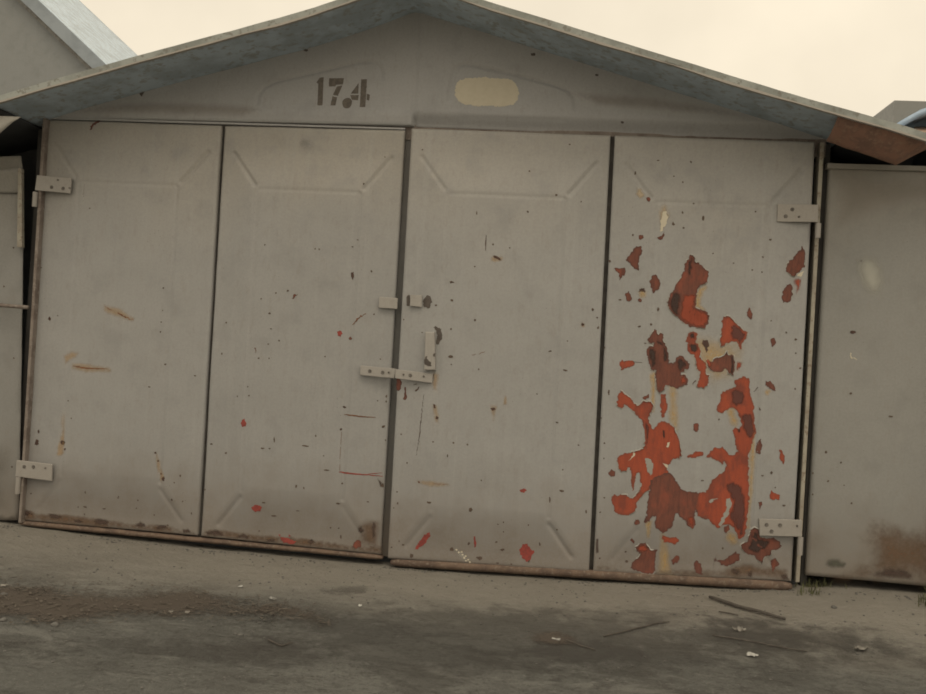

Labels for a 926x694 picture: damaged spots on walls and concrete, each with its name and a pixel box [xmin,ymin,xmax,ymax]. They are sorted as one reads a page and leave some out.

peeling [657,211,668,240]
peeling [615,235,644,281]
peeling [782,246,806,303]
peeling [608,254,781,574]
peeling [519,544,534,562]